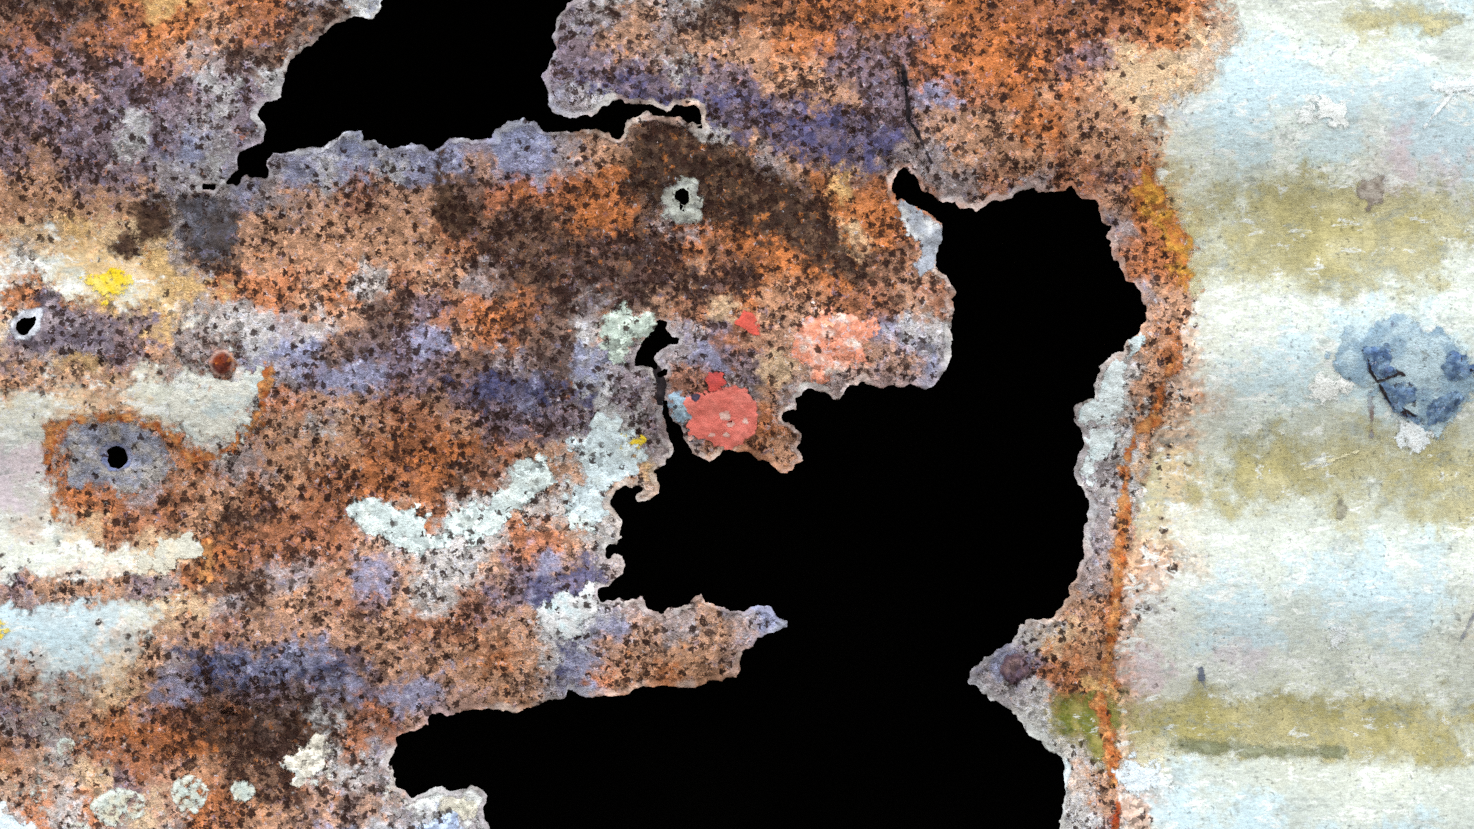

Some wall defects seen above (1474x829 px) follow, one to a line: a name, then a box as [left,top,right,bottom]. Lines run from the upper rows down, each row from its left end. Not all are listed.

peeling [7,281,119,361]
corrosion [41,432,57,476]
corrosion [42,411,136,436]
corrosion [133,410,162,425]
peeling [57,365,264,499]
corrosion [137,418,196,461]
corrosion [683,407,719,456]
peeling [662,391,748,441]
peeling [1078,332,1146,487]
peeling [343,409,648,558]
corrosion [51,498,65,522]
peeling [536,581,598,644]